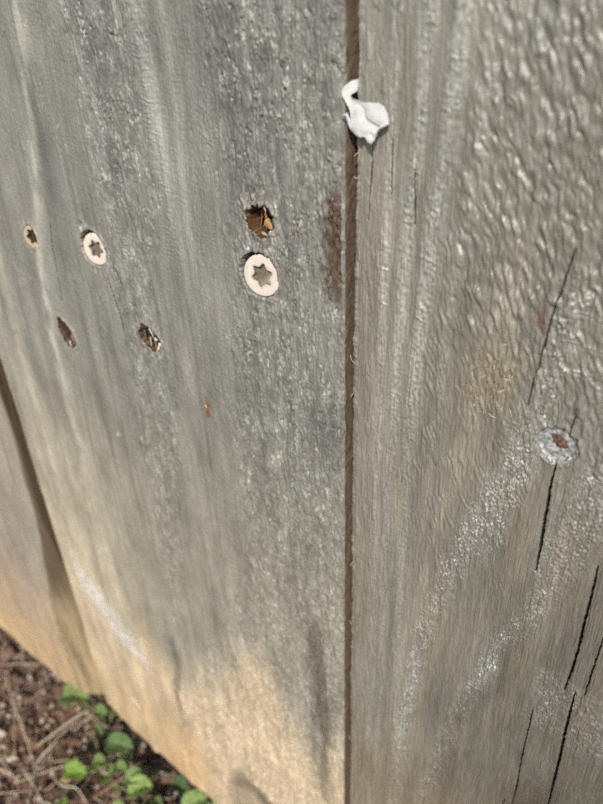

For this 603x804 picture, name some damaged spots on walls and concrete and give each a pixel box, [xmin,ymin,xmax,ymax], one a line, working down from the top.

rust [322,200,342,296]
crack [528,249,576,405]
rust [537,427,579,464]
crack [536,464,557,569]
crack [548,566,603,804]
crack [503,711,533,803]